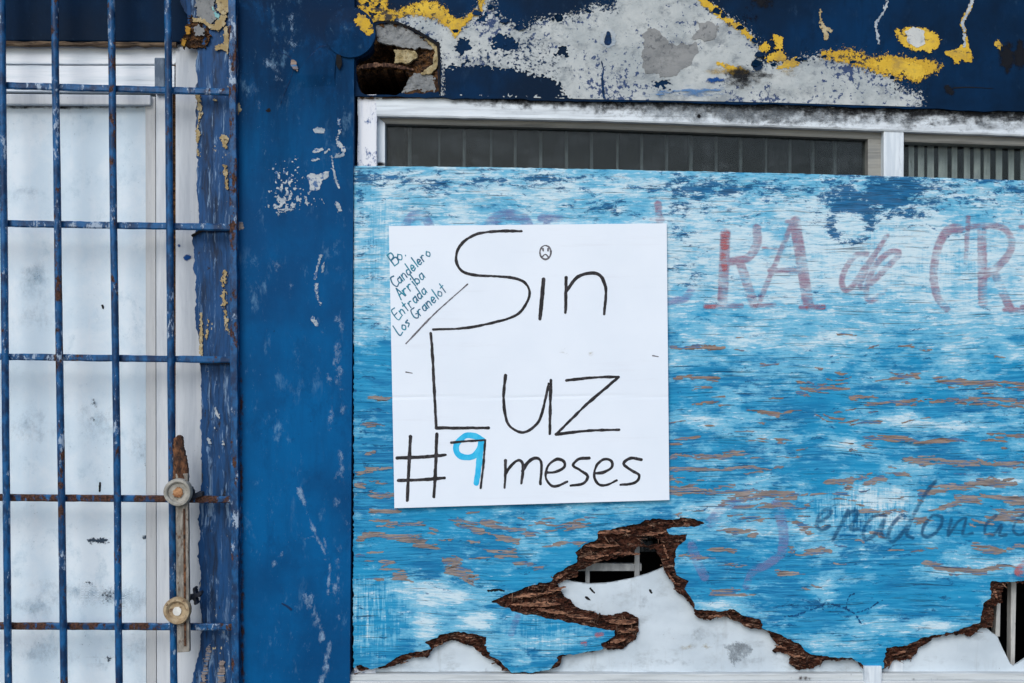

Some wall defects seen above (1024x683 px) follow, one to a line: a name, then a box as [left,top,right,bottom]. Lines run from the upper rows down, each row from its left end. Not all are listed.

spalling [180,0,229,55]
peeling [354,0,944,107]
peeling [265,118,346,215]
peeling [220,270,229,331]
peeling [199,312,209,356]
peeling [669,337,744,351]
peeling [669,367,1024,576]
peeling [354,450,597,586]
peeling [708,587,756,596]
peeling [774,569,822,590]